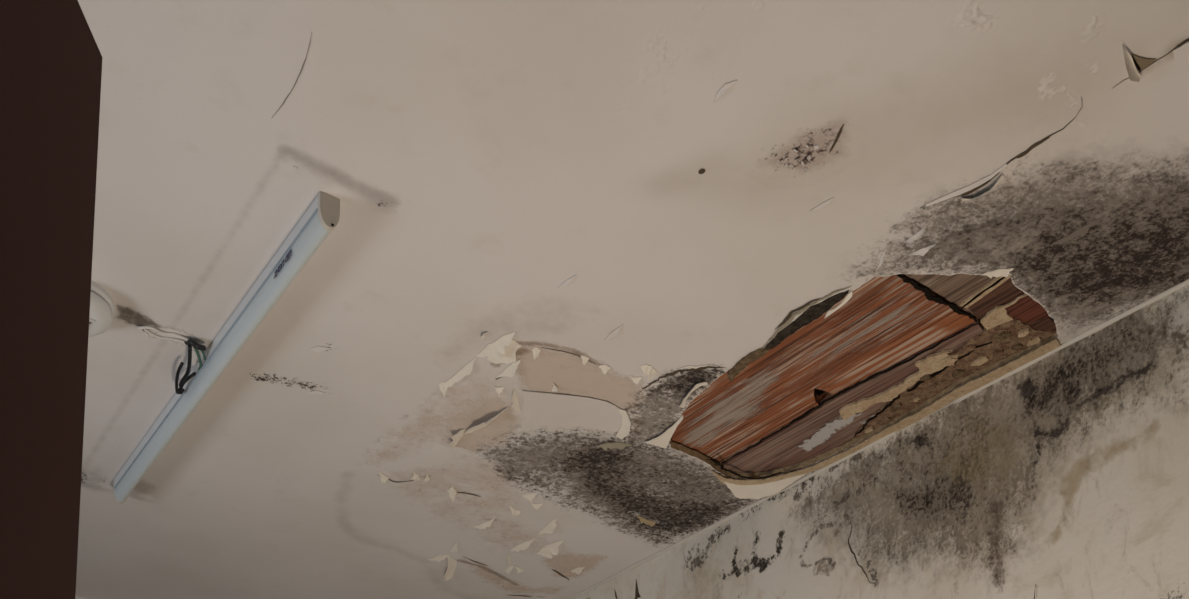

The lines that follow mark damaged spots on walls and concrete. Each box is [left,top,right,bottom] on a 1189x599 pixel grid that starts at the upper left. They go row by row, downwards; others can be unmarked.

crack [271,32,312,119]
crack [1112,38,1189,89]
crack [921,98,1083,208]
peeling [424,331,657,451]
flaking render [727,346,772,382]
water stain [478,161,1189,584]
flaking render [942,328,1040,378]
peeling [428,519,600,597]